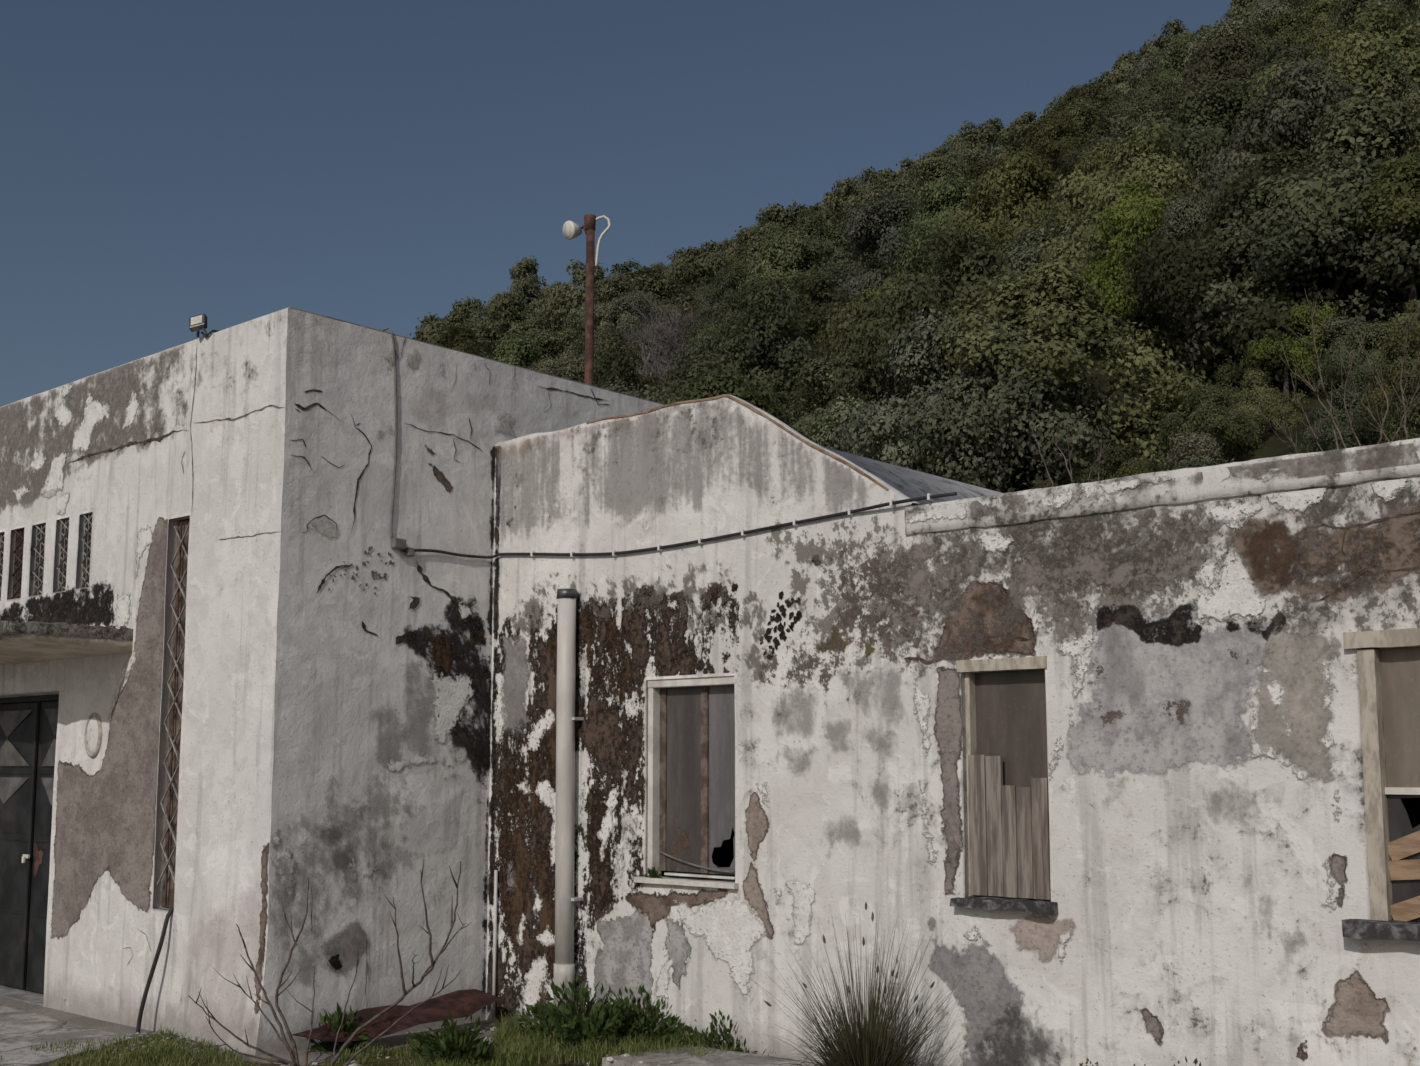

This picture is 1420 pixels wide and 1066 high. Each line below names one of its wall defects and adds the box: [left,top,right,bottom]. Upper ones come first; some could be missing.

peeling [13,384,139,516]
crack [69,338,372,593]
crack [408,419,483,463]
crack [362,561,463,644]
peeling [1195,552,1267,625]
spalling [50,517,167,940]
leakage [373,402,1420,1022]
spalling [1247,620,1342,821]
peeling [517,780,556,865]
peeling [516,886,555,1015]
peeling [593,782,816,1012]
spalling [1321,970,1391,1043]